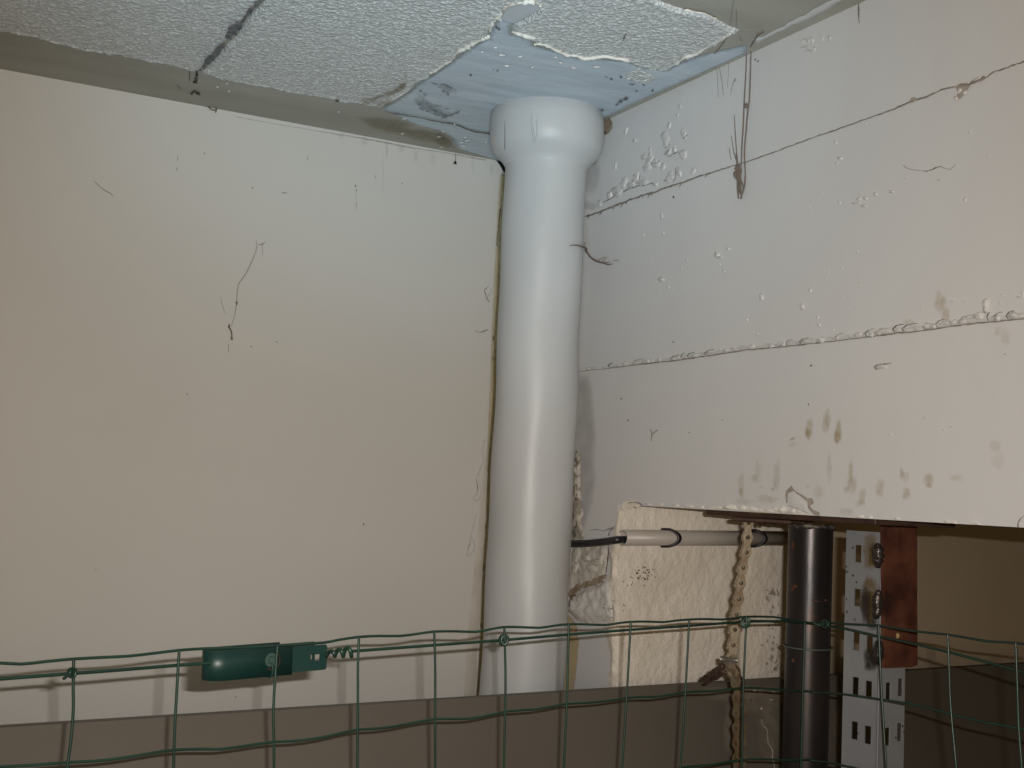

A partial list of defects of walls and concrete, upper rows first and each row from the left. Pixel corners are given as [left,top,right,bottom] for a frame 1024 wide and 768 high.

peeling [500,0,542,23]
crack [985,61,1024,79]
spalling [604,118,612,135]
crack [585,86,955,219]
crack [865,310,1014,336]